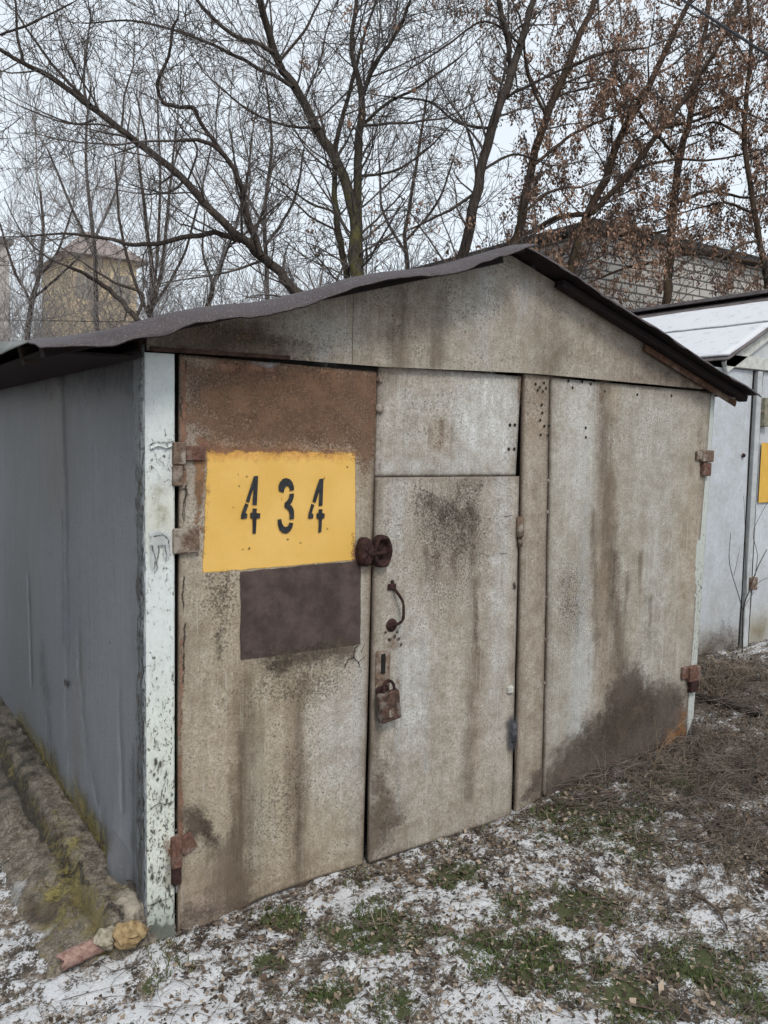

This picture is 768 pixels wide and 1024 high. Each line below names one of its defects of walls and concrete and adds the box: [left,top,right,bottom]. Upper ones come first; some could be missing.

corrosion [179,357,377,530]
leakage [413,469,494,568]